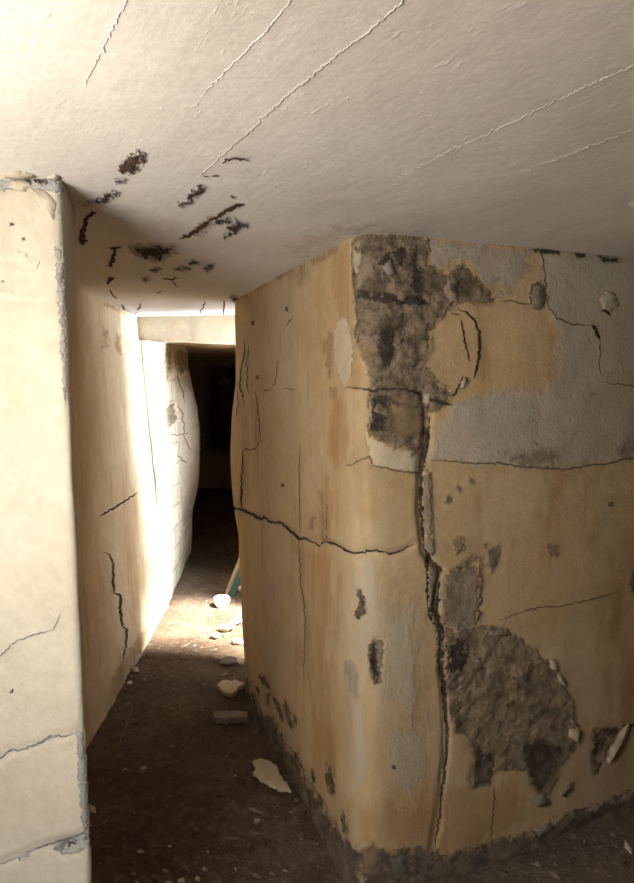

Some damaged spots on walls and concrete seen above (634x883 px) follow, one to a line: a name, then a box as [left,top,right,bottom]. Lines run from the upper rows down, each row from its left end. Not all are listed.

crack [502,250,634,387]
crack [234,308,481,848]
crack [501,591,620,620]
crack [0,614,60,656]
spalling [438,535,582,807]
crack [0,733,75,759]
damp [244,658,634,883]
spalling [591,724,634,776]
crack [0,831,91,864]